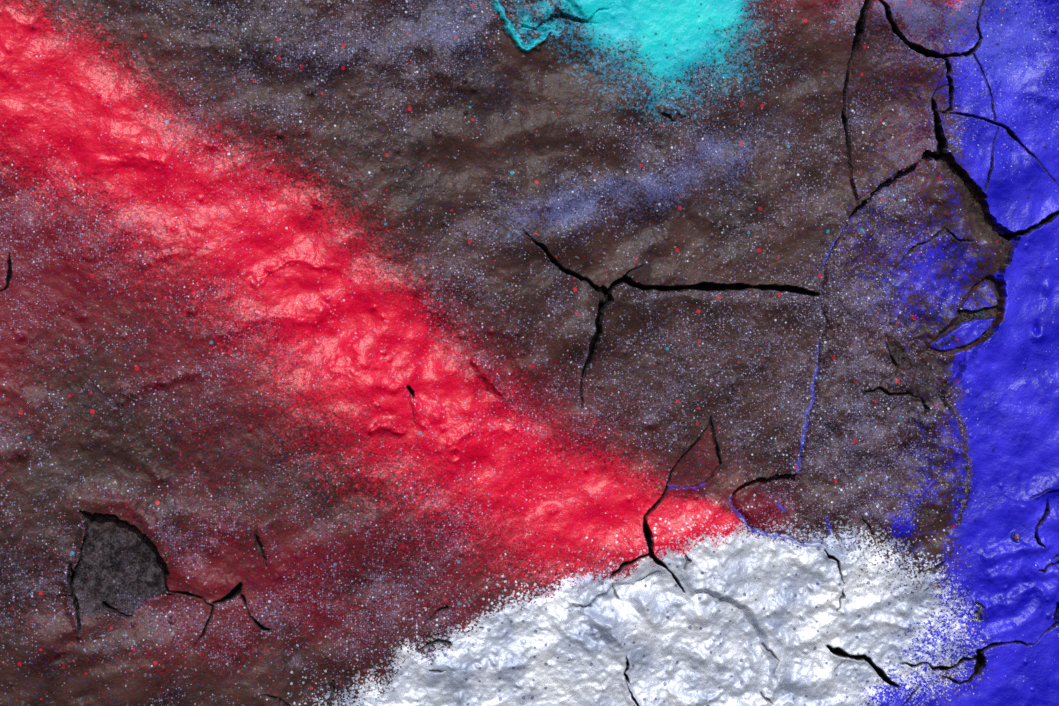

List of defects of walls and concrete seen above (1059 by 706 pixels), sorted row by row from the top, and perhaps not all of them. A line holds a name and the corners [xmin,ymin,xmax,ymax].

peeling [492,0,615,54]
crack [840,0,1059,241]
spalling [0,251,14,294]
crack [521,228,820,410]
spalling [62,510,170,639]
crack [608,414,724,594]
crack [1029,488,1059,576]
crack [826,619,1059,706]